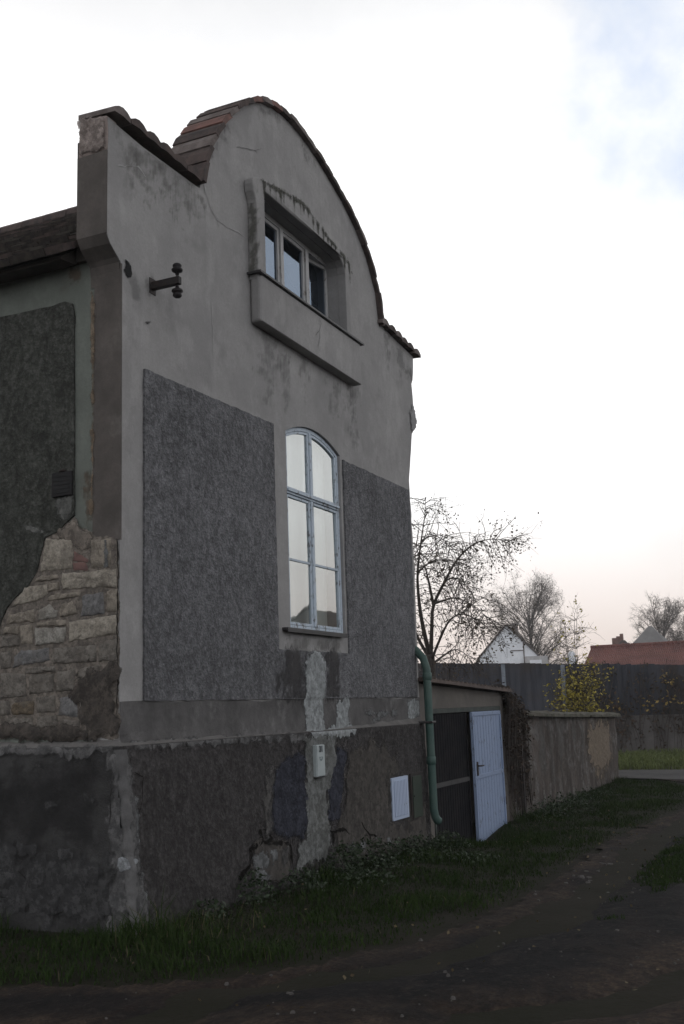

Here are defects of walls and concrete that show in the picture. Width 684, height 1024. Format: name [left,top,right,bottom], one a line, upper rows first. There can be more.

flaking render [77,116,106,155]
water stain [263,180,350,272]
flaking render [0,496,149,939]
flaking render [250,752,309,883]